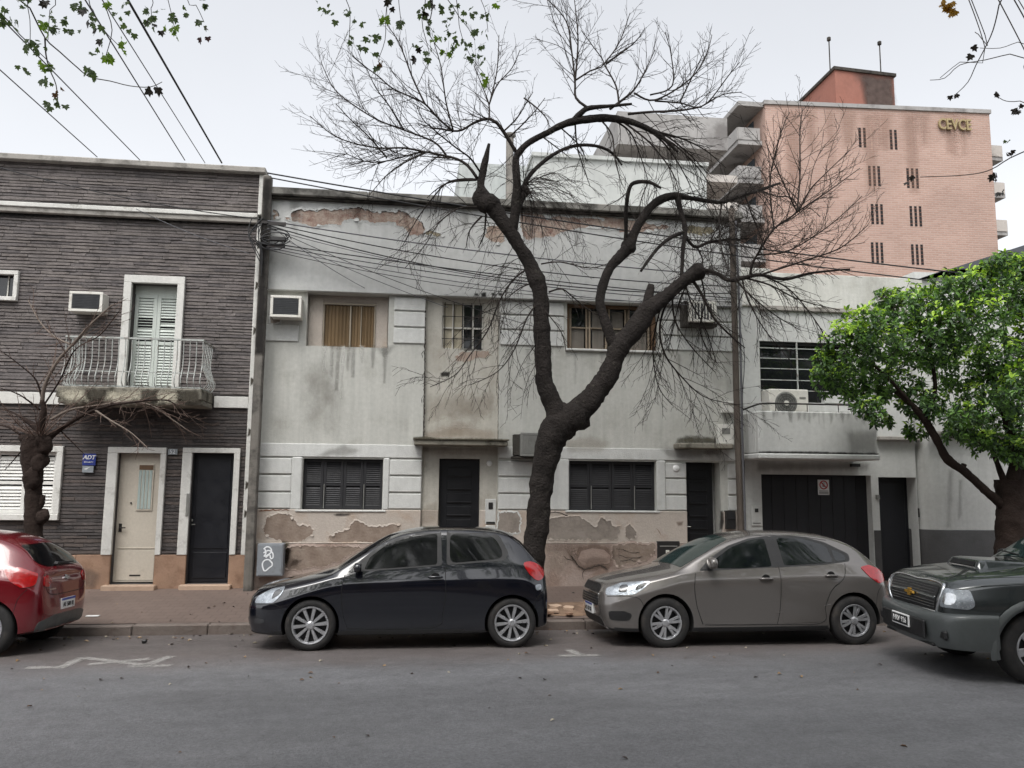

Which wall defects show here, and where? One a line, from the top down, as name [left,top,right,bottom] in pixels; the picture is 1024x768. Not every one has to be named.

peeling [271,204,446,239]
peeling [481,223,507,246]
peeling [518,212,718,242]
peeling [496,510,522,535]
spalling [261,512,401,573]
peeling [546,515,657,569]